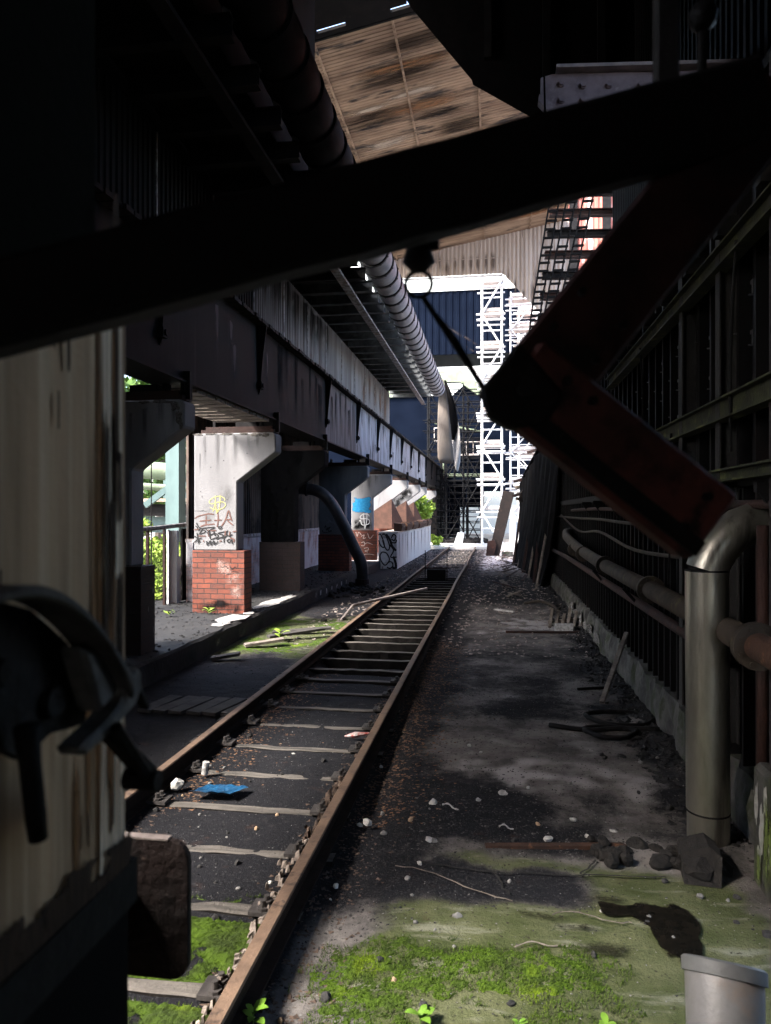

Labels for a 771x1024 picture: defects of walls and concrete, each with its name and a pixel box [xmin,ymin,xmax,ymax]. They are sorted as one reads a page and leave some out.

water stain [263,282,329,351]
water stain [267,345,370,420]